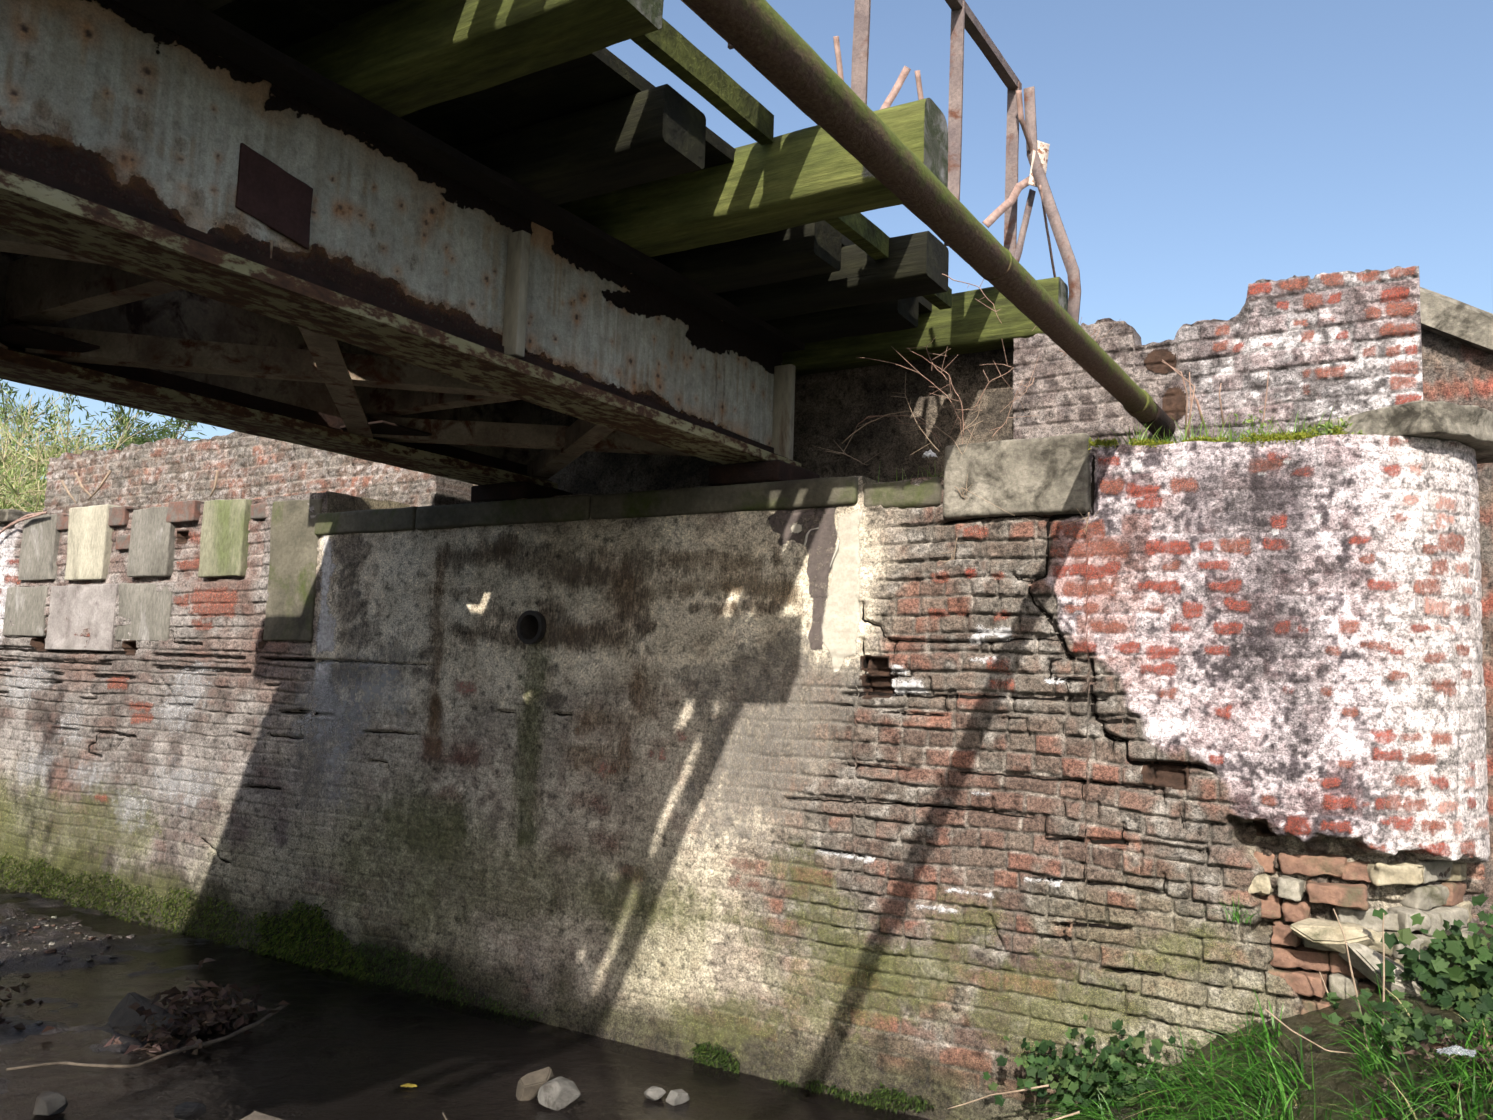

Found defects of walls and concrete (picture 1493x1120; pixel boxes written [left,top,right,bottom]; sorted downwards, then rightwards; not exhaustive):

peeling [0,121,186,225]
peeling [86,0,533,235]
peeling [207,222,503,345]
peeling [551,232,783,374]
water stain [164,667,203,728]
crack [787,455,1214,893]
peeling [1050,515,1288,699]
peeling [1349,494,1472,696]
water stain [917,888,994,912]
crack [1055,923,1128,942]
crack [1105,968,1162,1009]
spalling [1247,729,1490,1015]